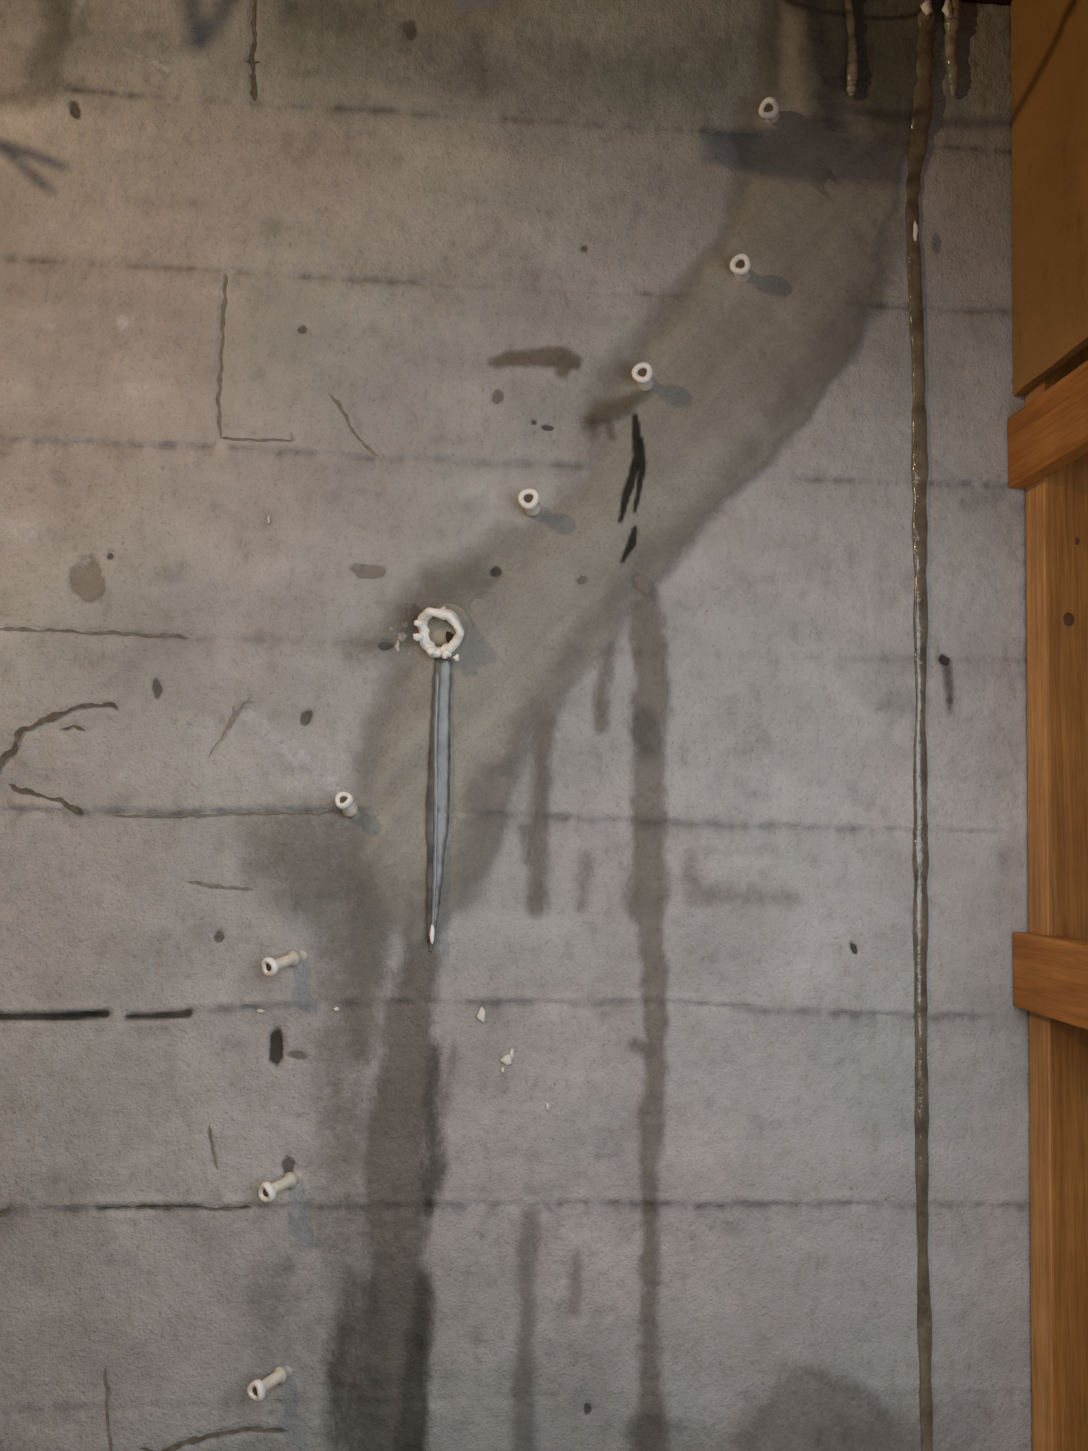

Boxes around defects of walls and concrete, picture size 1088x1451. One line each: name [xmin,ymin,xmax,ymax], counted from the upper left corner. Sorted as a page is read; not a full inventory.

damp [492,348,580,376]
damp [587,391,648,438]
damp [402,572,488,624]
damp [597,643,612,731]
damp [943,664,953,702]
crack [0,696,342,818]
damp [528,718,553,914]
damp [629,587,668,1451]
damp [515,1213,535,1451]
crack [104,1368,287,1451]